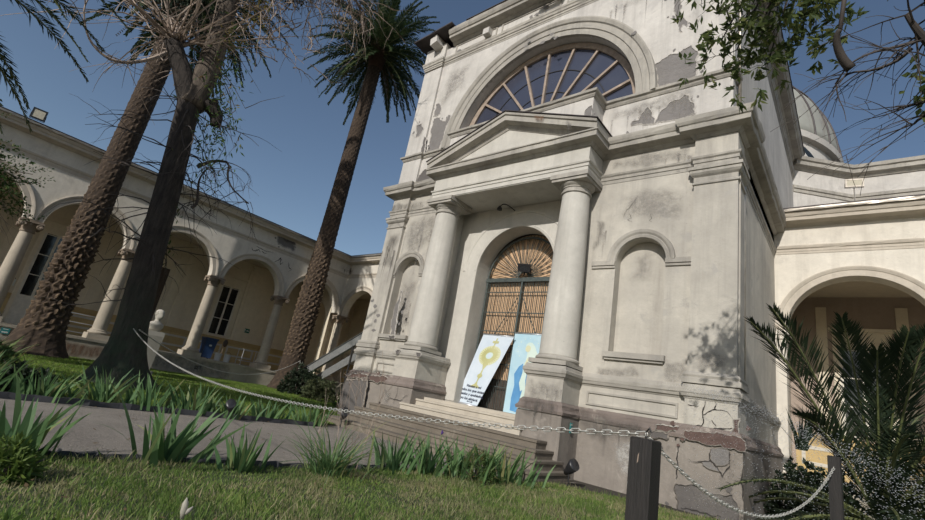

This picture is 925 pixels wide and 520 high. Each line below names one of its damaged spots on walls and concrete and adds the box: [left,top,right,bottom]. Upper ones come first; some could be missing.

peeling [655,44,708,87]
peeling [412,103,452,153]
peeling [626,94,699,134]
flaking render [655,418,751,452]
crack [676,401,744,501]